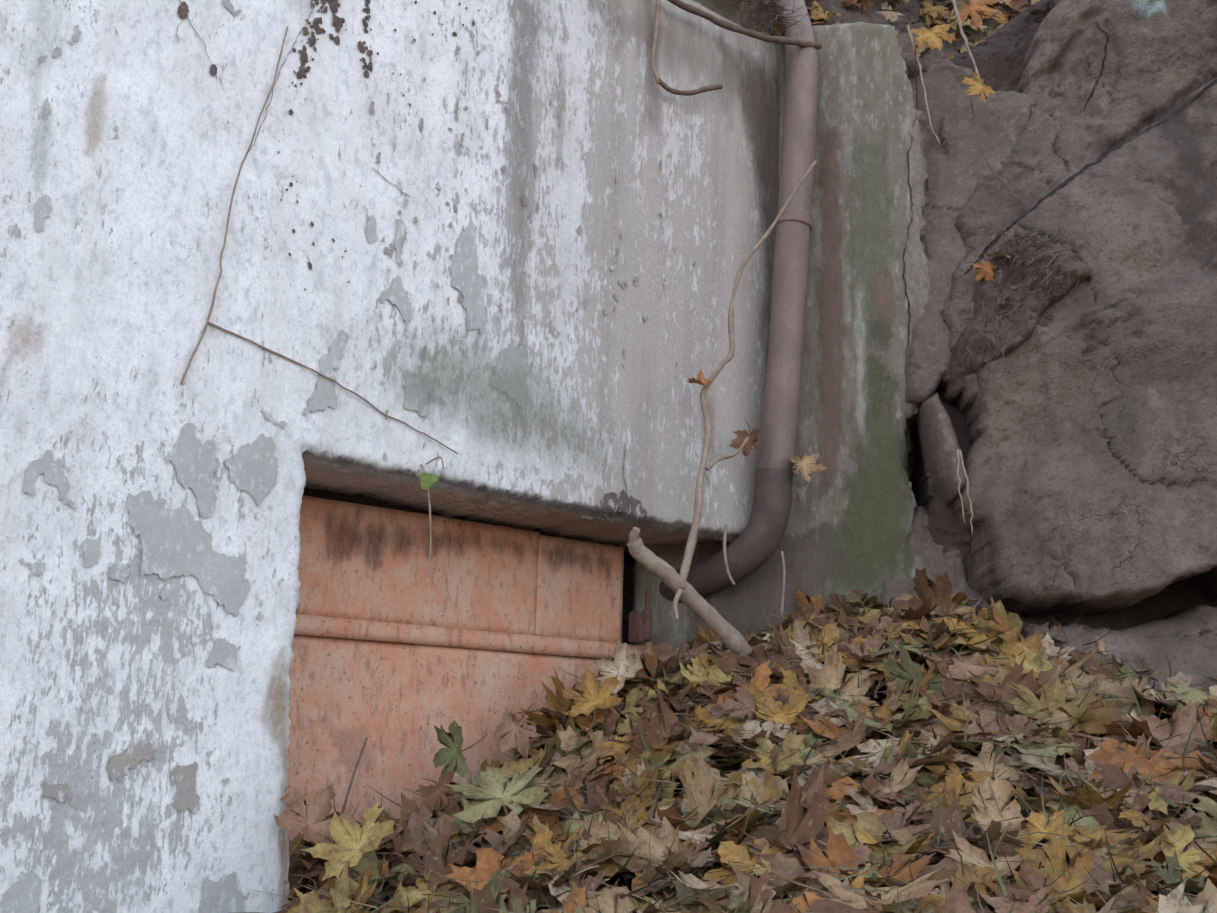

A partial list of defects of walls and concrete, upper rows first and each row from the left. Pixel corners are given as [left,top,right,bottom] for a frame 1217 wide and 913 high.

peeling [448,97,468,146]
damp [732,56,780,359]
peeling [366,210,418,325]
peeling [436,182,503,334]
damp [850,142,890,428]
peeling [303,329,349,416]
peeling [23,450,76,509]
peeling [81,408,287,617]
peeling [19,558,46,576]
peeling [205,638,240,671]
peeling [107,726,154,781]
peeling [171,750,213,815]